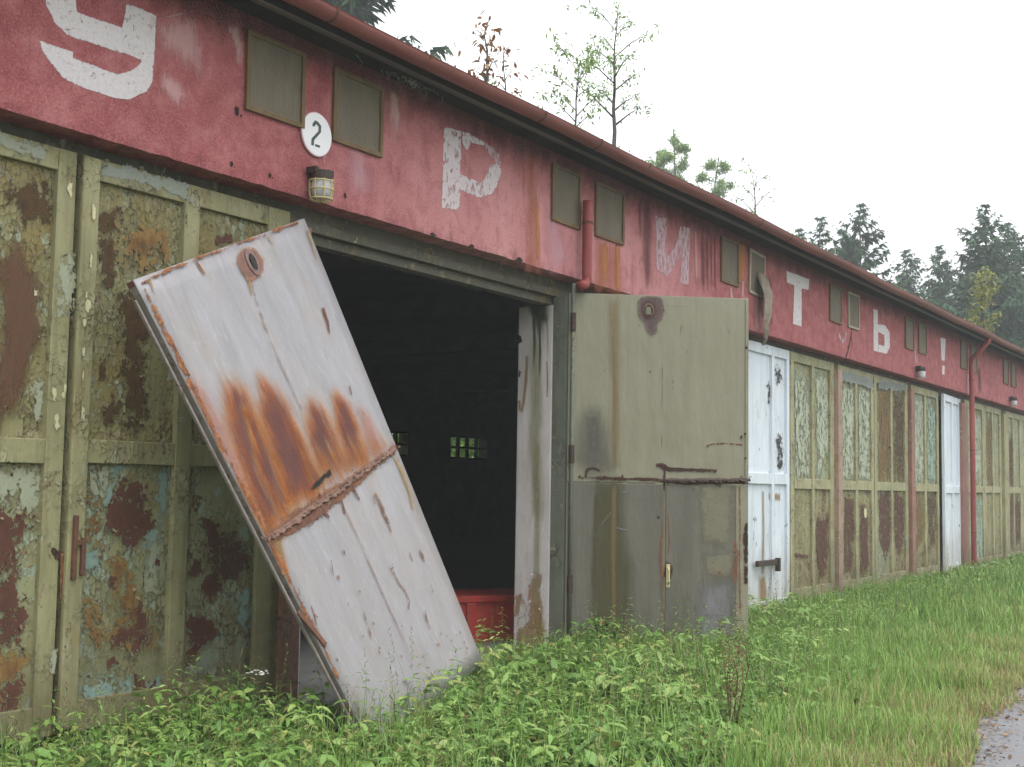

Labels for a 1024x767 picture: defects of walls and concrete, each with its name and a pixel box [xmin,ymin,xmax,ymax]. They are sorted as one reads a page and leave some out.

peeling [101,159,197,204]
peeling [90,203,178,432]
corrosion [638,296,664,335]
peeling [0,463,41,712]
peeling [78,464,171,699]
peeling [184,516,253,677]
corrosion [141,222,413,679]
corrosion [578,463,751,638]
peeling [767,368,829,479]
peeling [795,514,829,583]
peeling [839,369,937,578]
peeling [975,410,995,558]